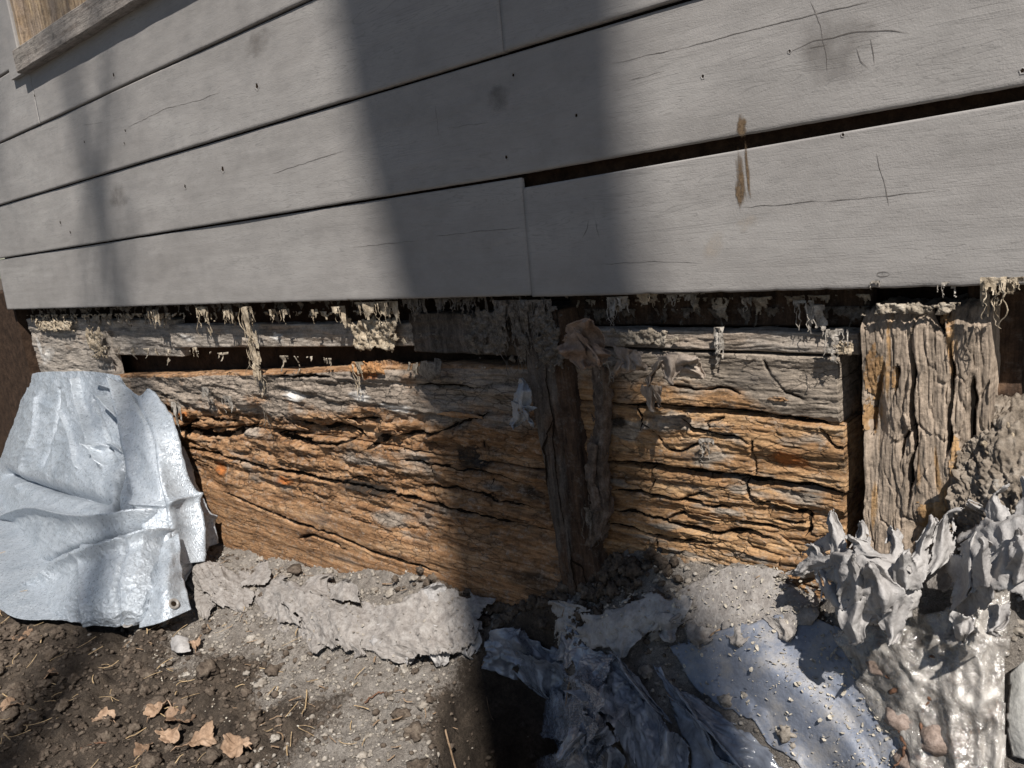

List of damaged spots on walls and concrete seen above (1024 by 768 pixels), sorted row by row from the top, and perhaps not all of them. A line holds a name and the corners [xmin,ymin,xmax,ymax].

crack [617,1,906,81]
corrosion [737,118,746,135]
spalling [372,359,402,369]
peeling [417,358,442,381]
crack [176,368,587,591]
crack [610,360,853,544]